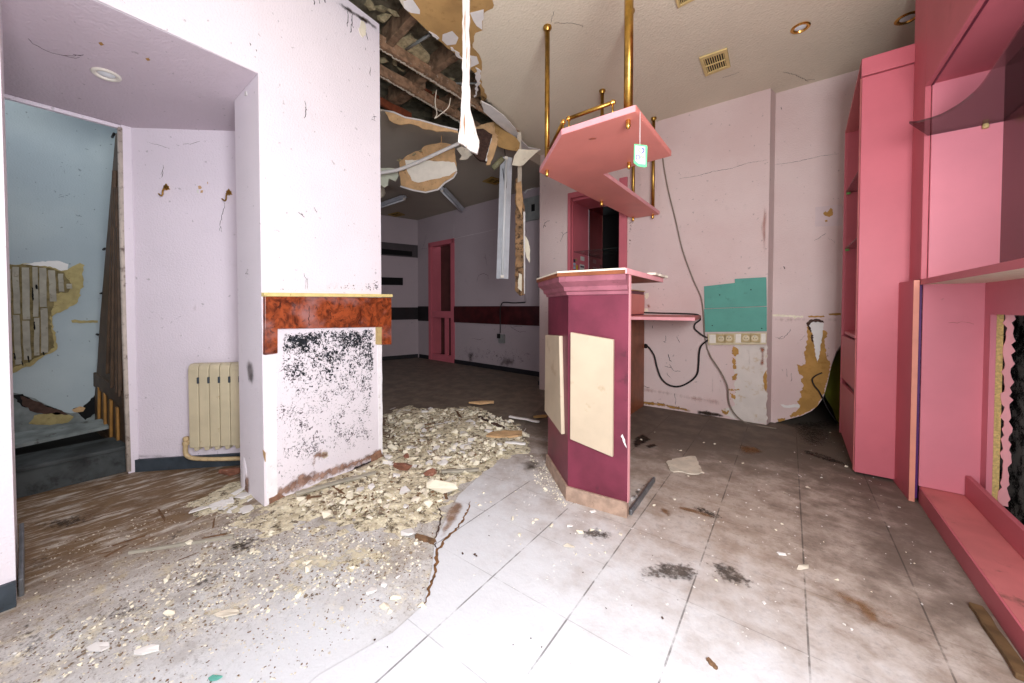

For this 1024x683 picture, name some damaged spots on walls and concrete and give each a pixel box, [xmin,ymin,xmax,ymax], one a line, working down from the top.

peeling [380,76,460,123]
peeling [379,48,479,111]
spalling [400,172,457,193]
flaking render [9,261,98,373]
water stain [269,329,382,504]
peeling [777,319,831,422]
crack [420,501,471,607]